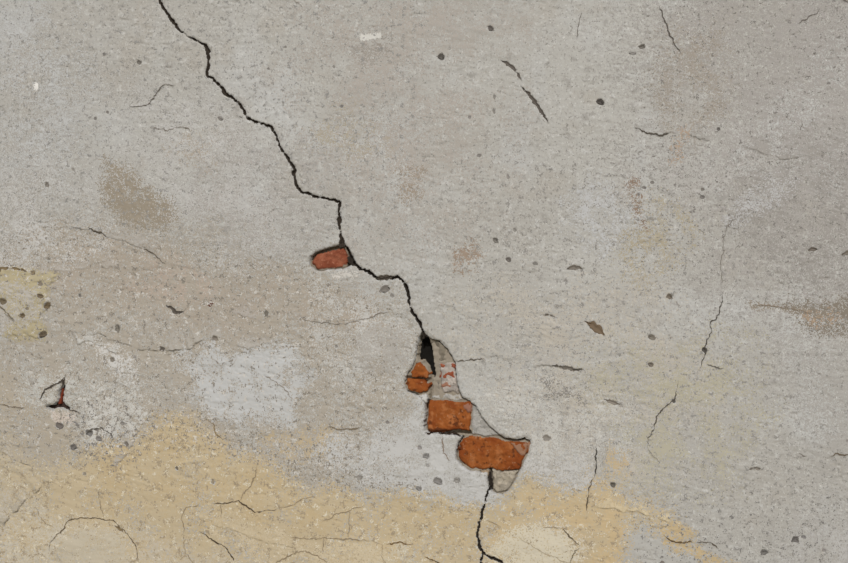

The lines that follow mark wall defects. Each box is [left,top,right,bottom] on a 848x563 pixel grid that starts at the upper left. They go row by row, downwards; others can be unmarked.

crack [159,0,428,339]
spalling [0,267,51,309]
spalling [311,245,351,271]
crack [40,377,65,399]
crack [426,432,461,460]
spalling [405,333,531,494]
peeling [0,491,140,563]
crack [38,491,138,558]
crack [181,469,316,563]
crack [276,506,410,563]
crack [476,471,503,563]
crack [522,527,579,563]